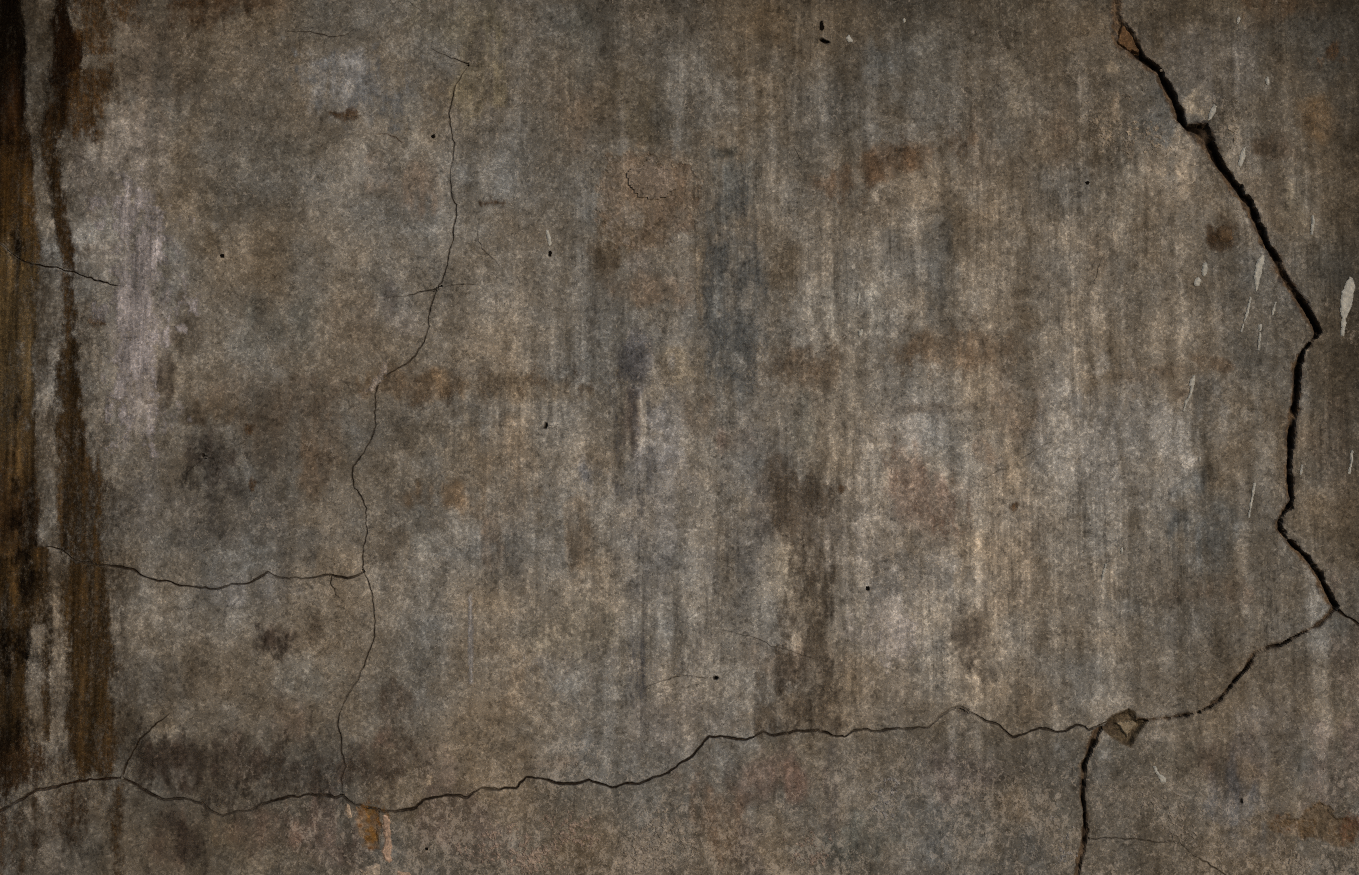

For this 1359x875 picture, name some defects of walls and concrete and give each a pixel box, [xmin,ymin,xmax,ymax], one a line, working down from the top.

crack [0,242,127,291]
damp [0,0,198,875]
crack [44,44,477,794]
crack [977,437,1056,486]
crack [1103,0,1359,728]
damp [137,724,288,812]
crack [0,700,1234,875]